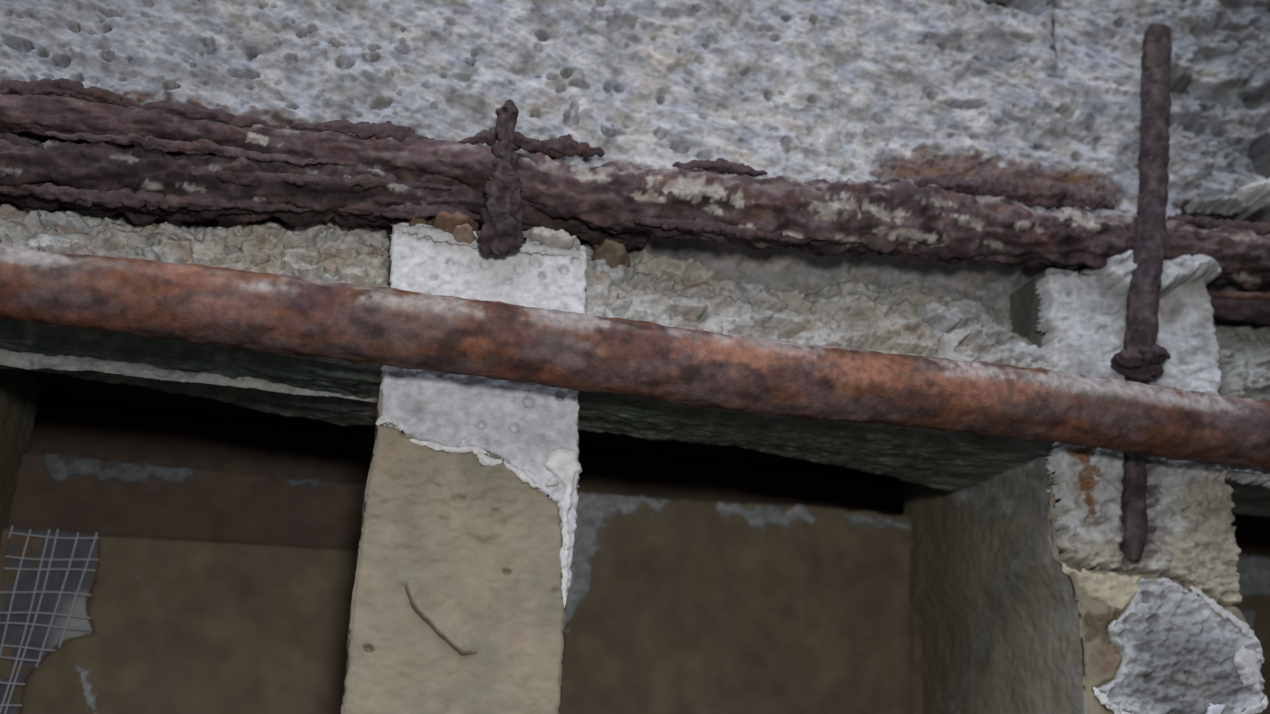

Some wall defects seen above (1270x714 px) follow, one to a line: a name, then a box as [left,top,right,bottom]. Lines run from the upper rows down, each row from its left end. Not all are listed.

corrosion [0,70,498,231]
spalling [0,203,1127,380]
corrosion [0,246,1270,522]
corrosion [514,131,1137,271]
spalling [1150,280,1270,401]
corrosion [1164,200,1270,325]
spalling [1184,178,1270,216]
peeling [0,528,97,714]
peeling [375,365,670,633]
peeling [715,501,815,532]
corrosion [1120,485,1159,566]
spalling [1045,442,1270,714]